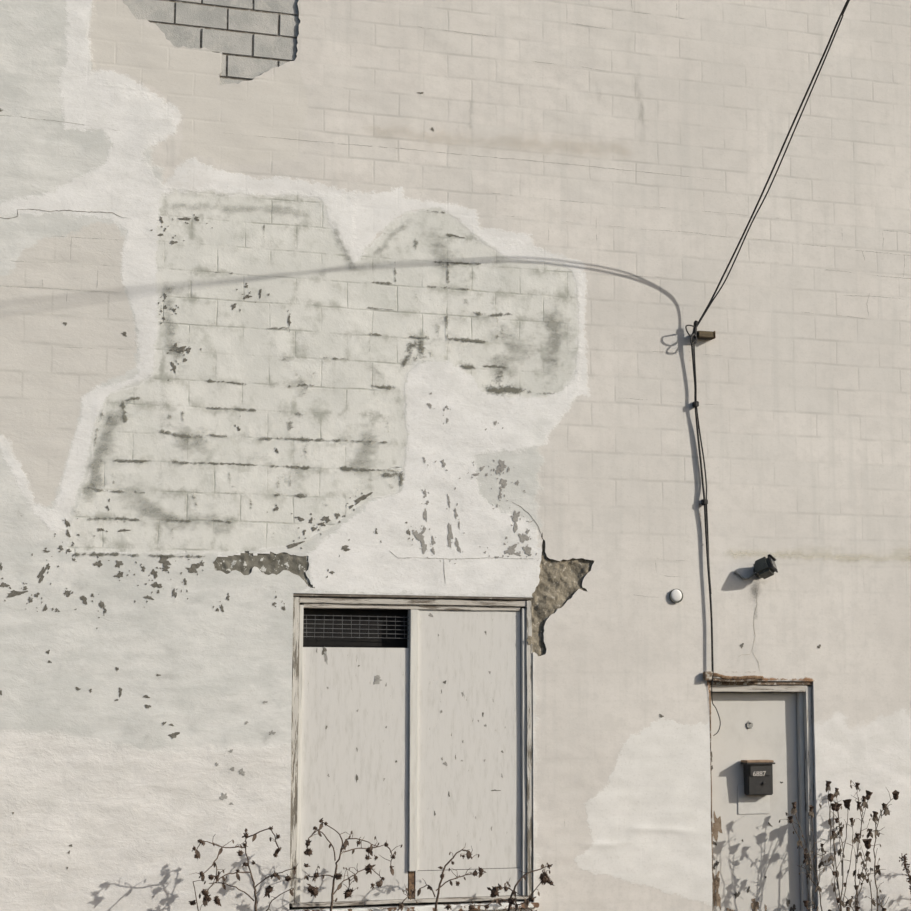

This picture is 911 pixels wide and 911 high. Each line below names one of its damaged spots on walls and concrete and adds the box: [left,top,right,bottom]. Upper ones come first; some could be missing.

spalling [123,0,300,85]
peeling [0,191,579,612]
spalling [405,459,594,656]
peeling [64,590,107,629]
peeling [713,811,722,846]
peeling [713,861,767,911]